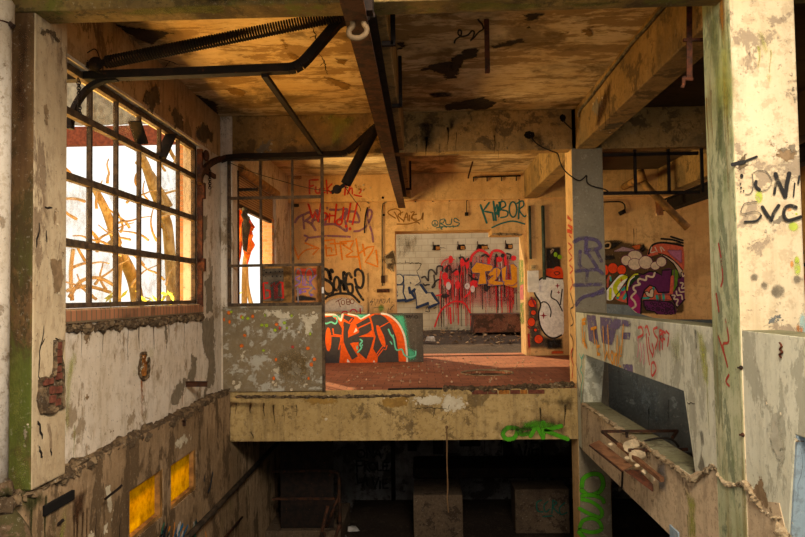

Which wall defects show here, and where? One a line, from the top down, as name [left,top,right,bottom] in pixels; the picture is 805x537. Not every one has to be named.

leakage [421,48,479,80]
leakage [430,93,506,161]
spalling [0,266,575,515]
spalling [581,400,793,537]
leakage [73,493,88,537]
peeling [88,485,114,537]